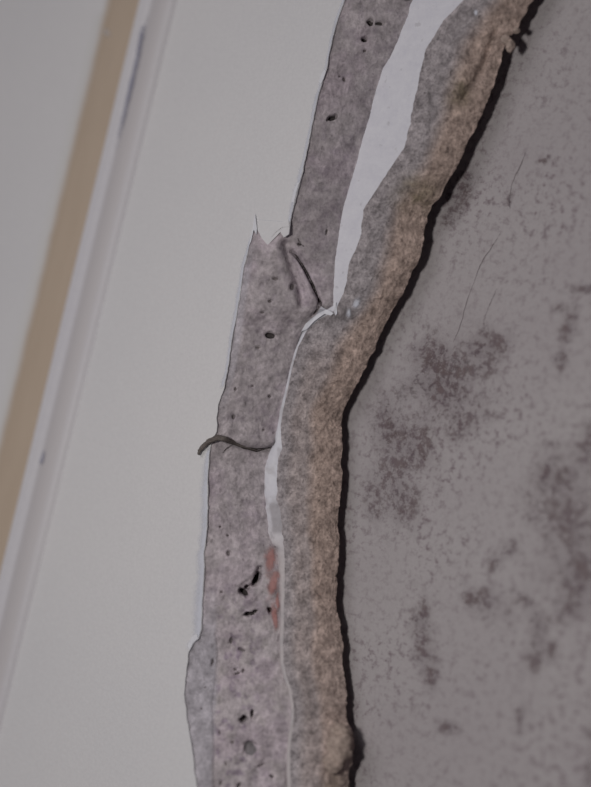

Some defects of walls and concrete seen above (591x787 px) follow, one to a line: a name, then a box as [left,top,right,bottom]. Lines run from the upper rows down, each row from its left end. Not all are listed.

spalling [185,0,534,787]
water stain [419,336,505,406]
water stain [370,410,431,519]